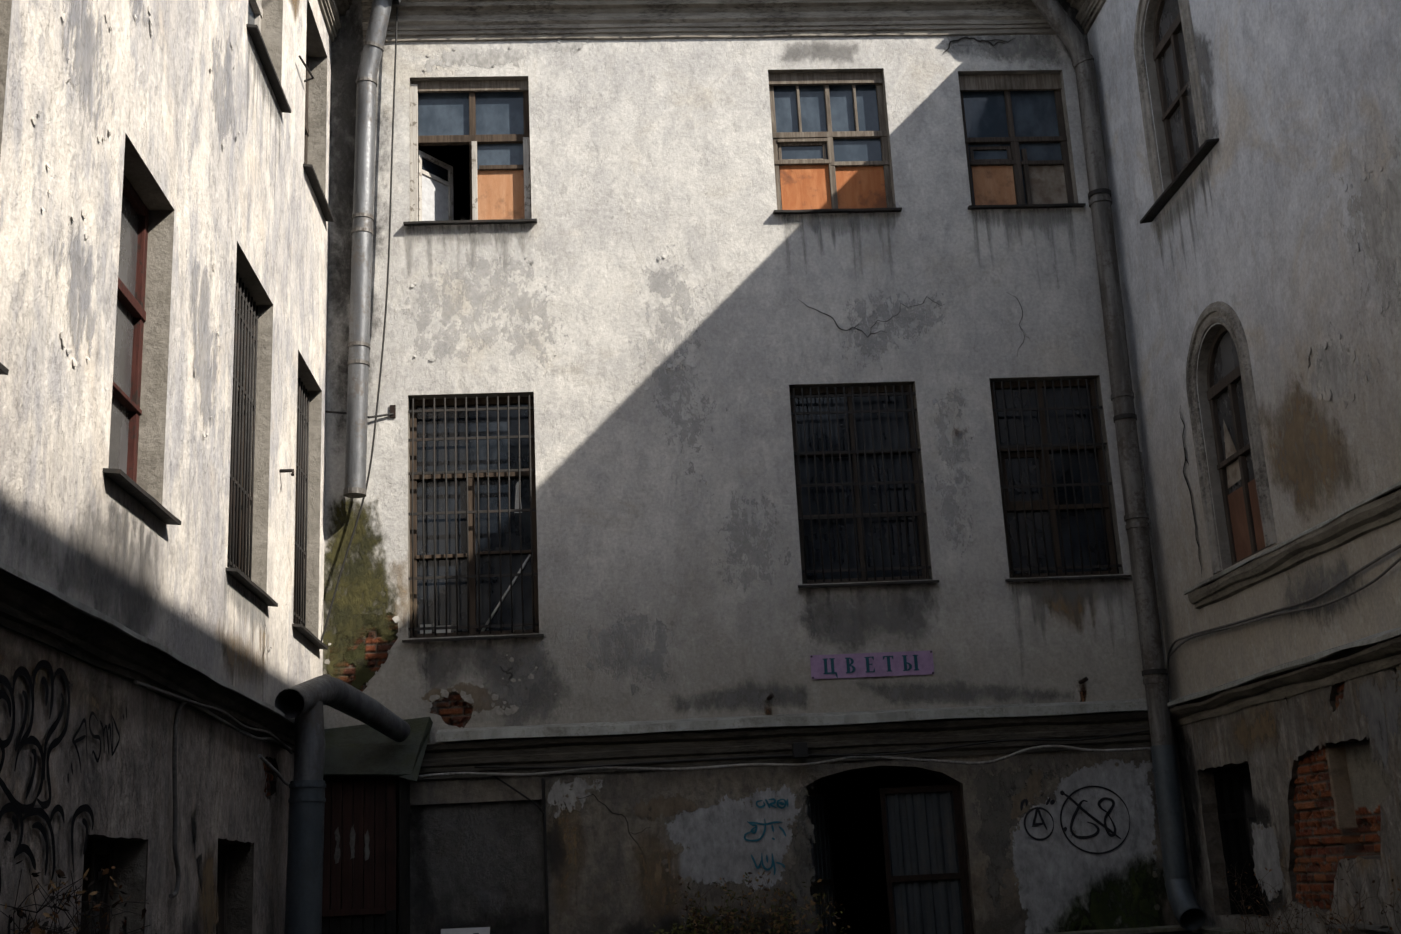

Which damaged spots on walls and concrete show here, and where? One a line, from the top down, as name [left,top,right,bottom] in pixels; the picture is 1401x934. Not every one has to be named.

crack [798,296,944,338]
water stain [1259,384,1350,511]
flaking render [421,655,538,729]
flaking render [1251,741,1392,916]